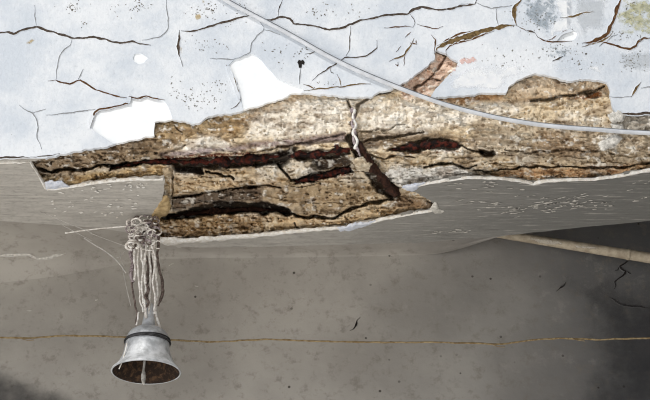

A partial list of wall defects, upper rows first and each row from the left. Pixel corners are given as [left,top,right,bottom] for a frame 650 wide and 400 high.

crack [0,0,650,160]
rust [112,152,280,168]
spalling [0,47,650,246]
rust [392,140,460,153]
rust [170,206,288,217]
crack [609,260,650,309]